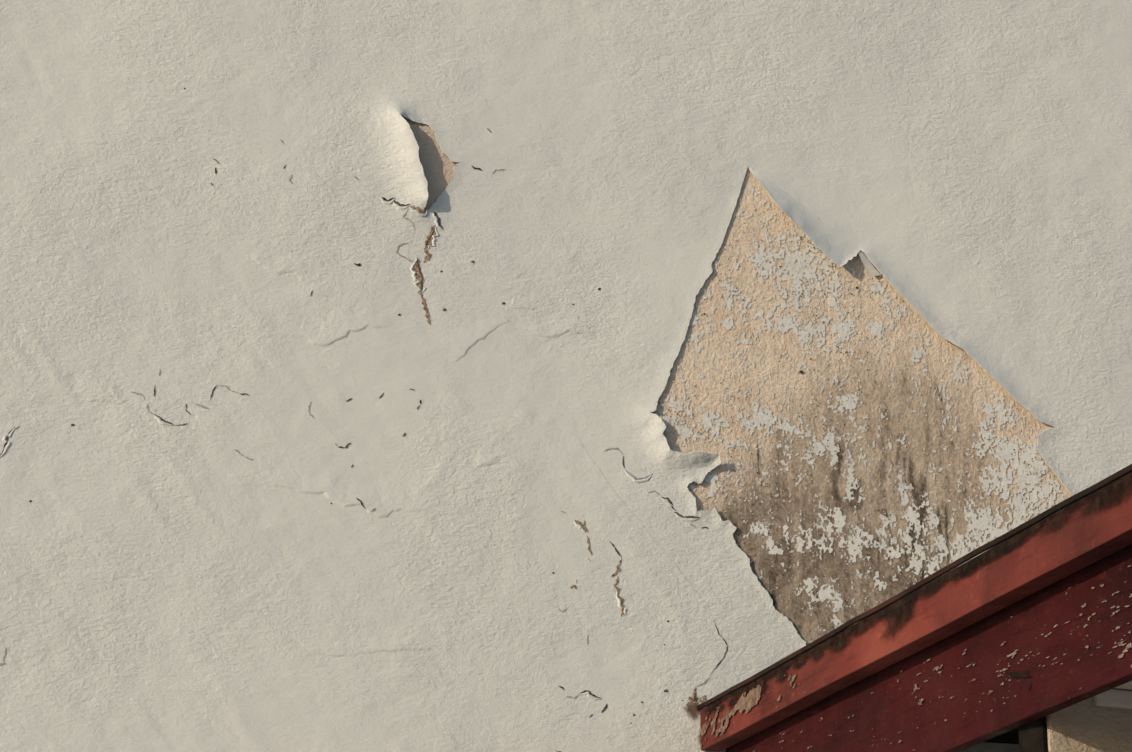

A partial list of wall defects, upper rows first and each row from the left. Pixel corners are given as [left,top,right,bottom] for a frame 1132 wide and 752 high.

crack [381,197,443,325]
peeling [401,115,457,210]
peeling [651,166,1072,645]
crack [558,425,728,698]
water stain [715,446,947,712]
spalling [871,581,1132,714]